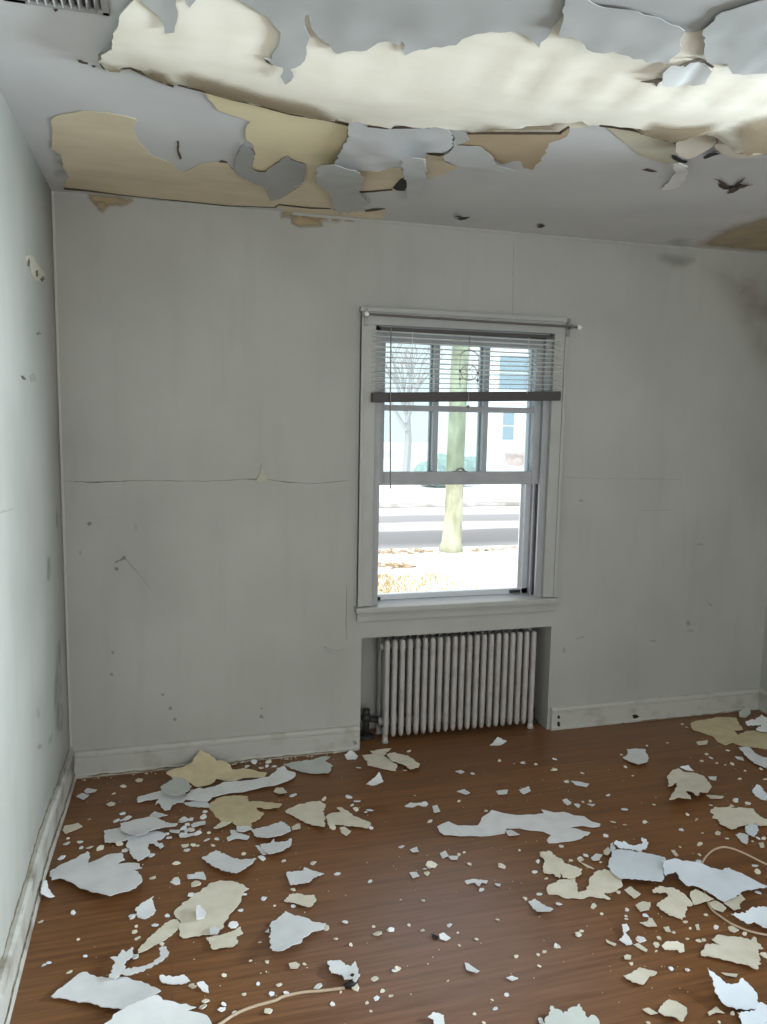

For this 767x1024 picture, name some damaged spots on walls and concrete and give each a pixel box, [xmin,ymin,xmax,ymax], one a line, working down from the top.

peeling [141,0,195,34]
peeling [238,0,767,87]
peeling [50,93,570,215]
peeling [608,128,764,191]
crack [71,464,350,484]